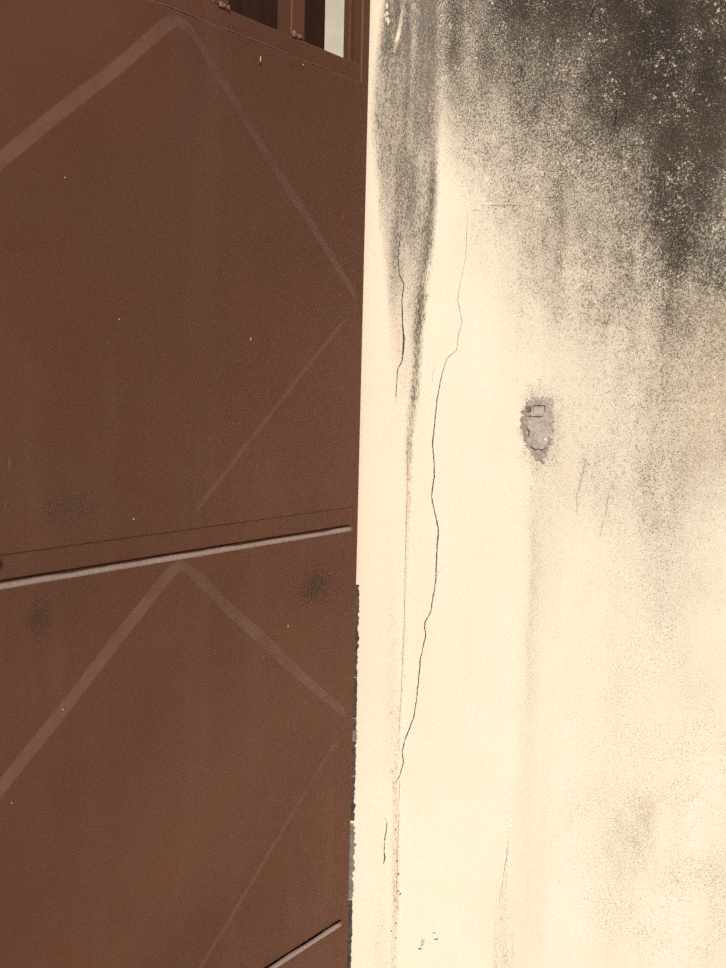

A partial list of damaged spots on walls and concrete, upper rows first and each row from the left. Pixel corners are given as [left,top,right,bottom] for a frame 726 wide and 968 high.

crack [395,209,405,403]
crack [383,241,467,903]
spalling [520,385,560,469]
water stain [375,0,726,497]